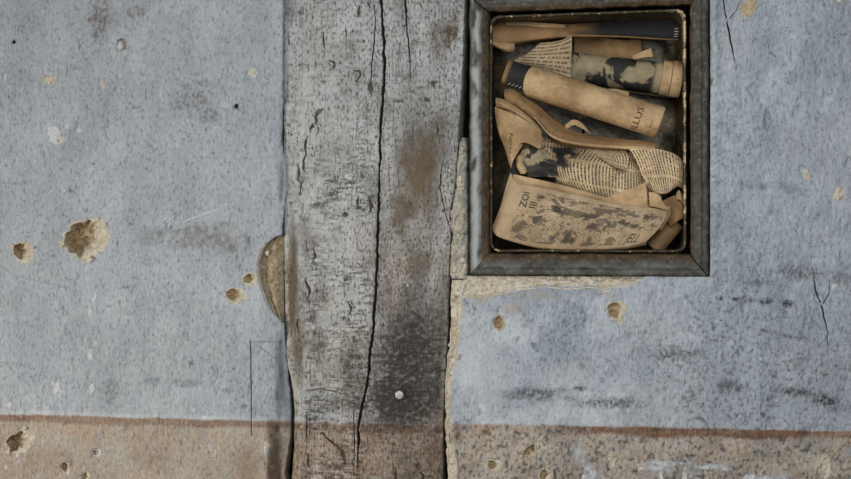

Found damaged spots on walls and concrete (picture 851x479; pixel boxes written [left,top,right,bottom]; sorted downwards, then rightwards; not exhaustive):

hole [10,241,34,263]
hole [59,217,110,263]
spalling [224,236,301,331]
crack [351,0,413,479]
spalling [445,137,644,479]
crack [810,274,832,345]
hole [4,426,36,455]